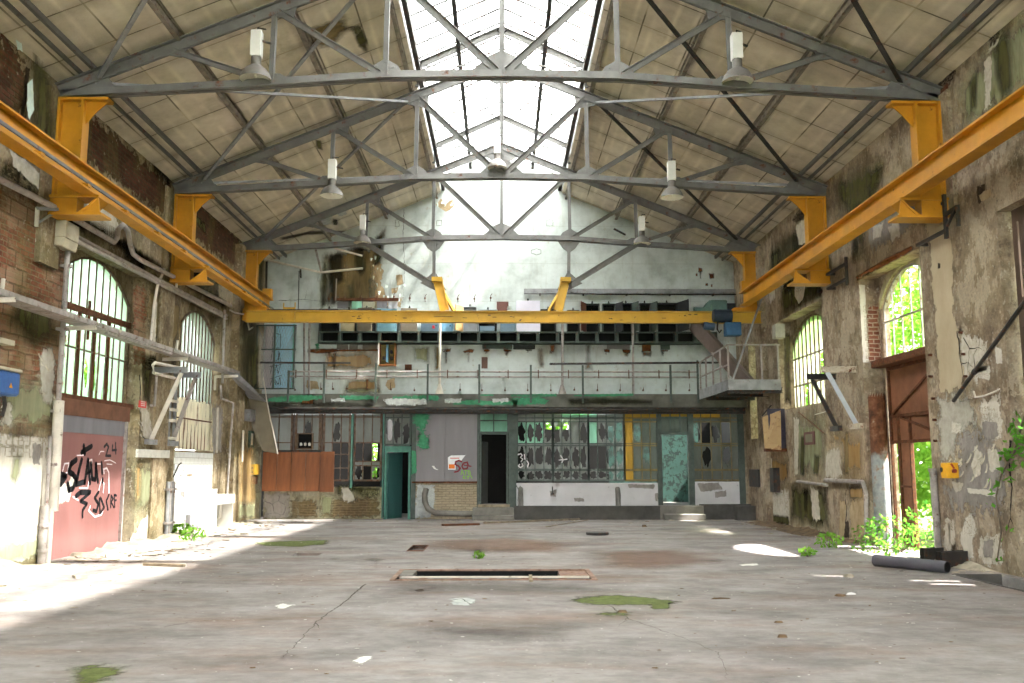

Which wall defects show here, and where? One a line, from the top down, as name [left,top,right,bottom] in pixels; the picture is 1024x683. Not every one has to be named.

spalling [0,34,34,120]
water stain [996,33,1012,97]
crack [956,330,989,383]
peeling [974,347,1002,386]
spalling [291,496,381,519]
peeling [937,392,1011,568]